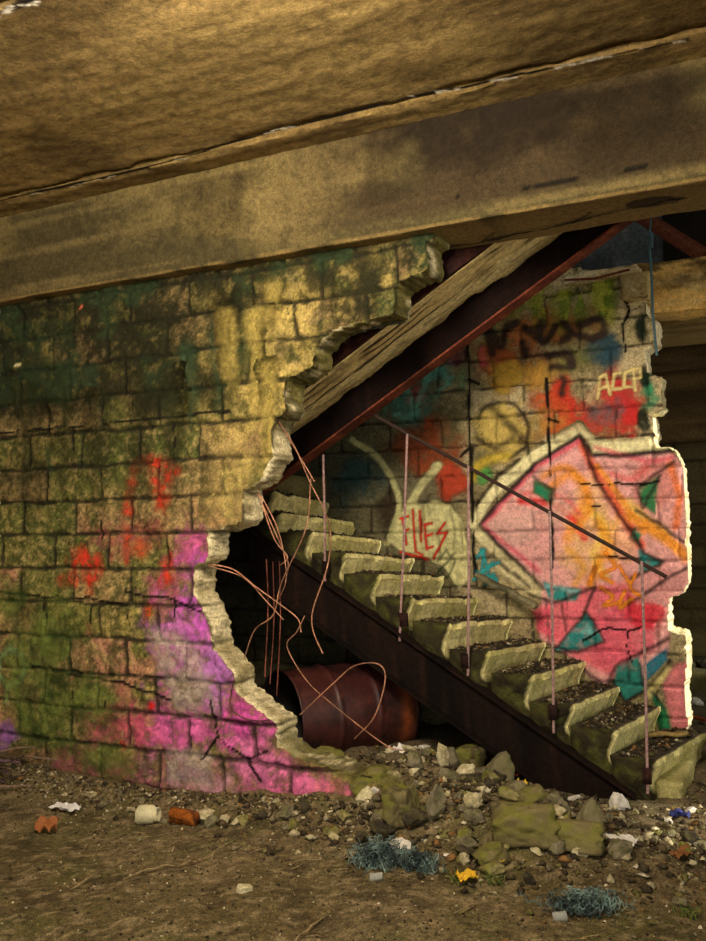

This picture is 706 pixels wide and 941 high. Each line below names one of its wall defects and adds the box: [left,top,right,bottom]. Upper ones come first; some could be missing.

crack [0,0,40,13]
crack [0,38,689,201]
spalling [266,326,283,358]
spalling [209,454,253,515]